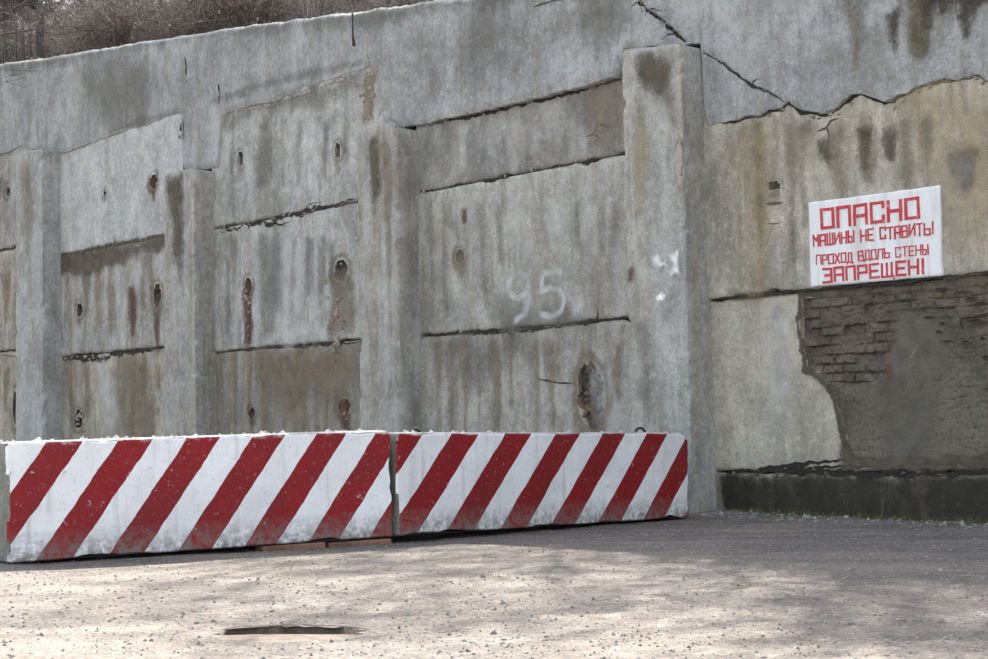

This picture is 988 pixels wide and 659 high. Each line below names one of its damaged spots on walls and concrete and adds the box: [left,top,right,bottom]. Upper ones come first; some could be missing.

crack [627,0,988,144]
damp [886,0,985,56]
rust [128,287,136,335]
spalling [322,248,359,367]
flaking render [795,275,988,469]